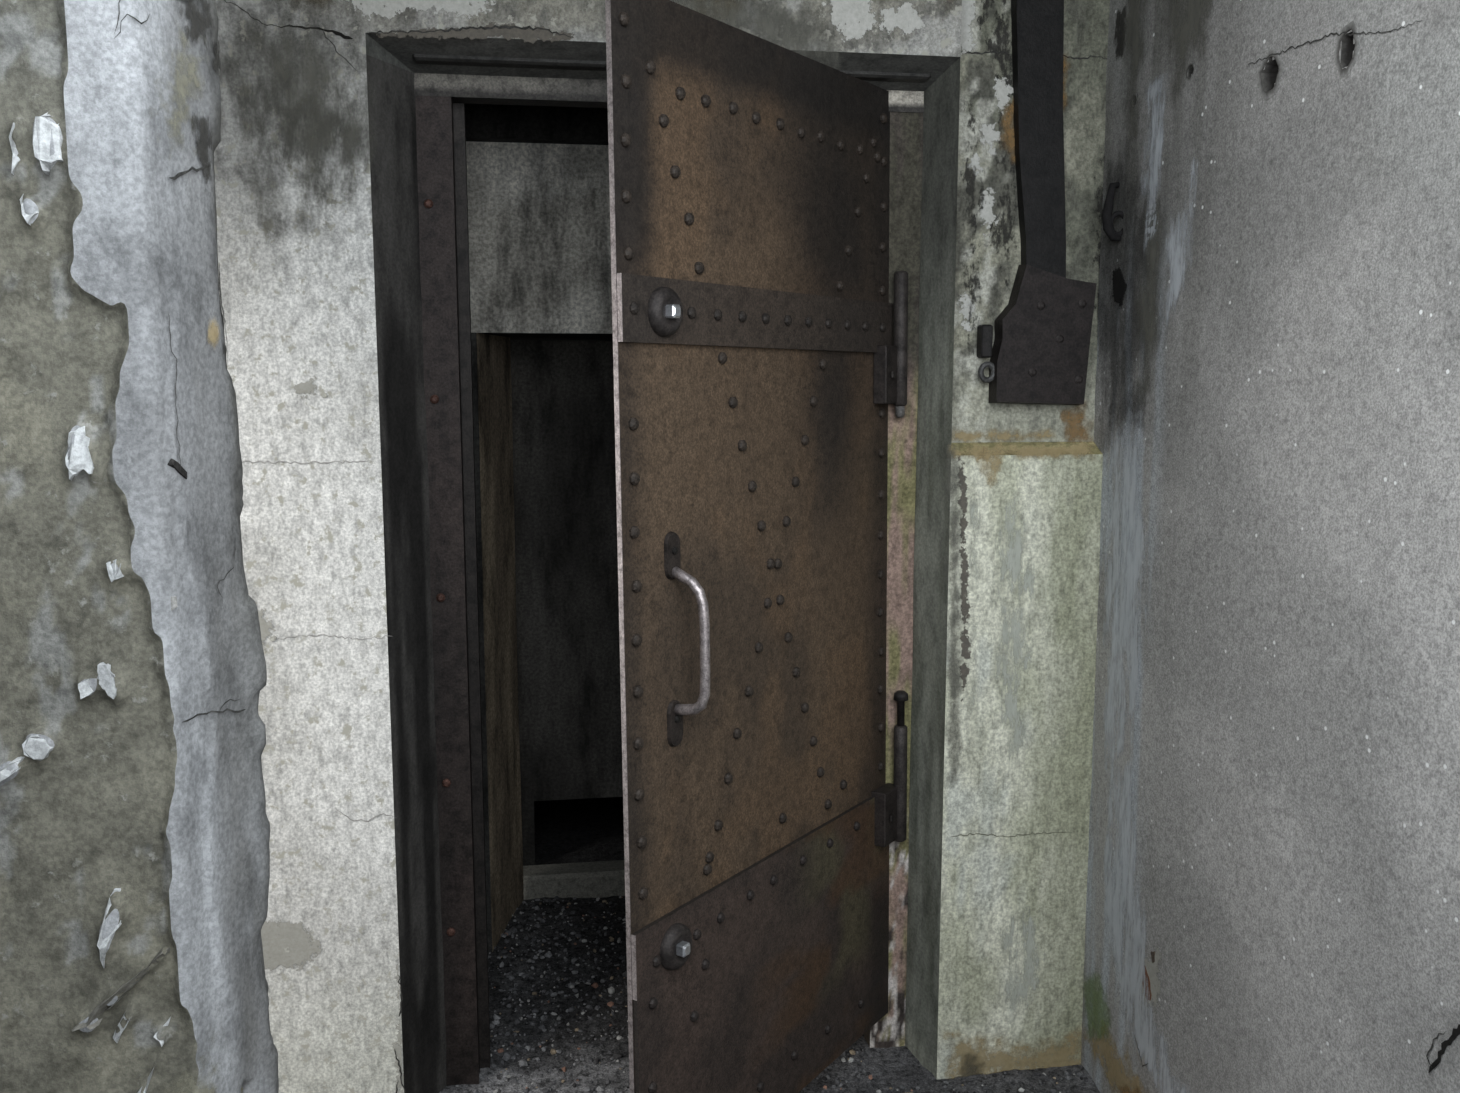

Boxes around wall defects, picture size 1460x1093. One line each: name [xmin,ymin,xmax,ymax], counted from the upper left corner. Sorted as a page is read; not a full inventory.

peeling [180,0,221,75]
leakage [670,0,833,56]
peeling [821,0,927,42]
spalling [944,0,976,55]
peeling [192,113,213,182]
leakage [238,23,365,234]
spalling [961,77,1013,237]
leakage [961,104,984,352]
spalling [956,292,975,331]
peeling [0,0,199,1093]
leakage [996,502,1035,773]
crack [1426,1024,1460,1073]